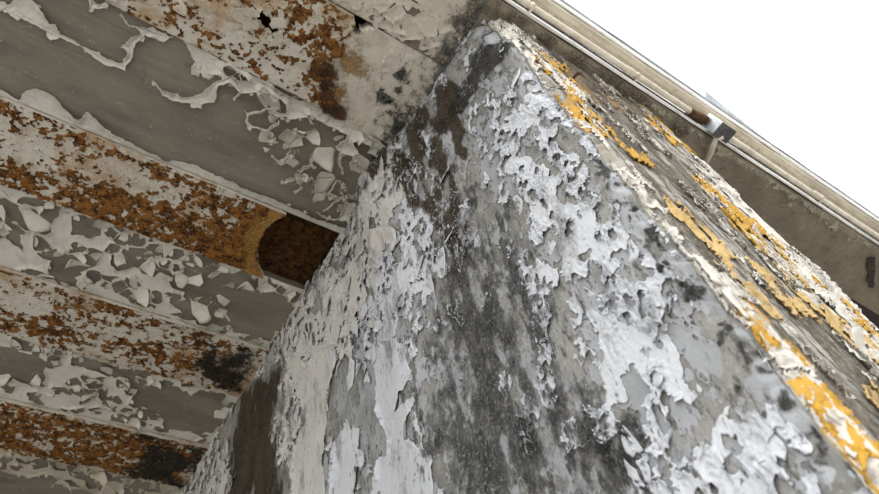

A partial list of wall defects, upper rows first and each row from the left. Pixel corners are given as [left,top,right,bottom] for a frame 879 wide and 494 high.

peeling [0,0,172,71]
peeling [172,0,196,16]
rust [119,0,375,121]
peeling [230,0,292,45]
rust [0,100,338,286]
peeling [0,41,481,494]
peeling [332,0,879,494]
leakage [366,0,879,494]
rust [0,270,268,394]
rust [0,400,208,488]
leakage [228,364,284,494]